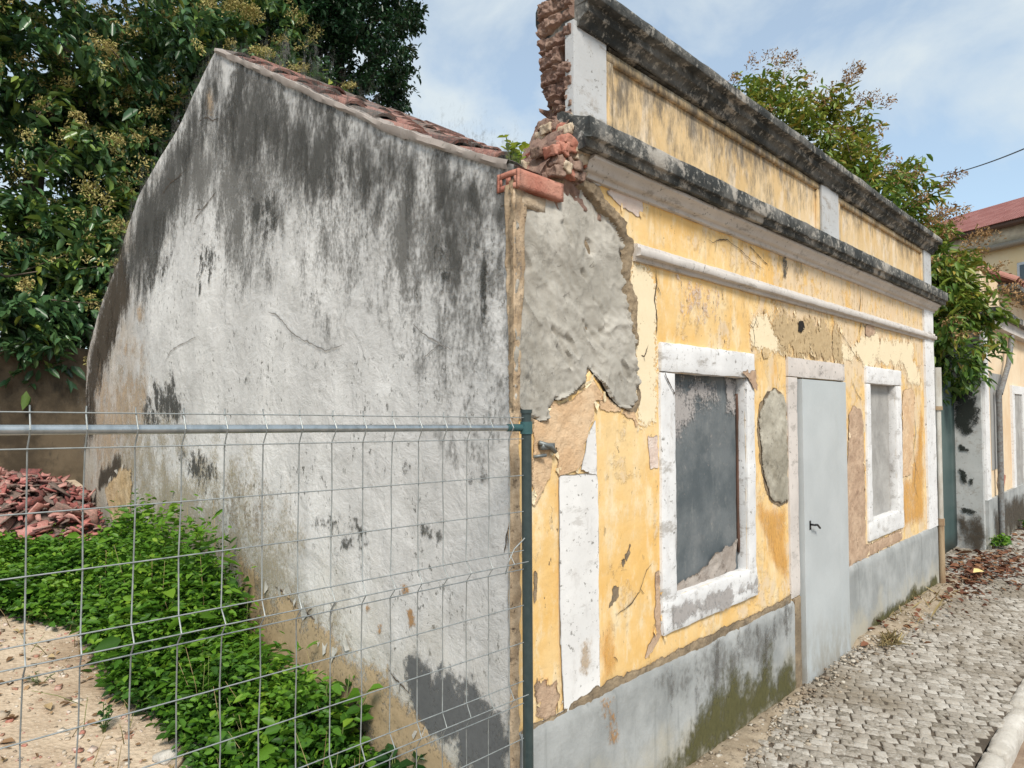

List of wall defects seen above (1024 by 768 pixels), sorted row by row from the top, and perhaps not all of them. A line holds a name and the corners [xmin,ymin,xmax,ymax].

spalling [105,464,132,524]
damp [80,40,516,630]
crack [269,312,343,351]
peeling [504,108,791,768]
peeling [749,299,920,477]
spalling [847,405,902,567]
damp [954,380,980,451]
damp [957,508,987,550]